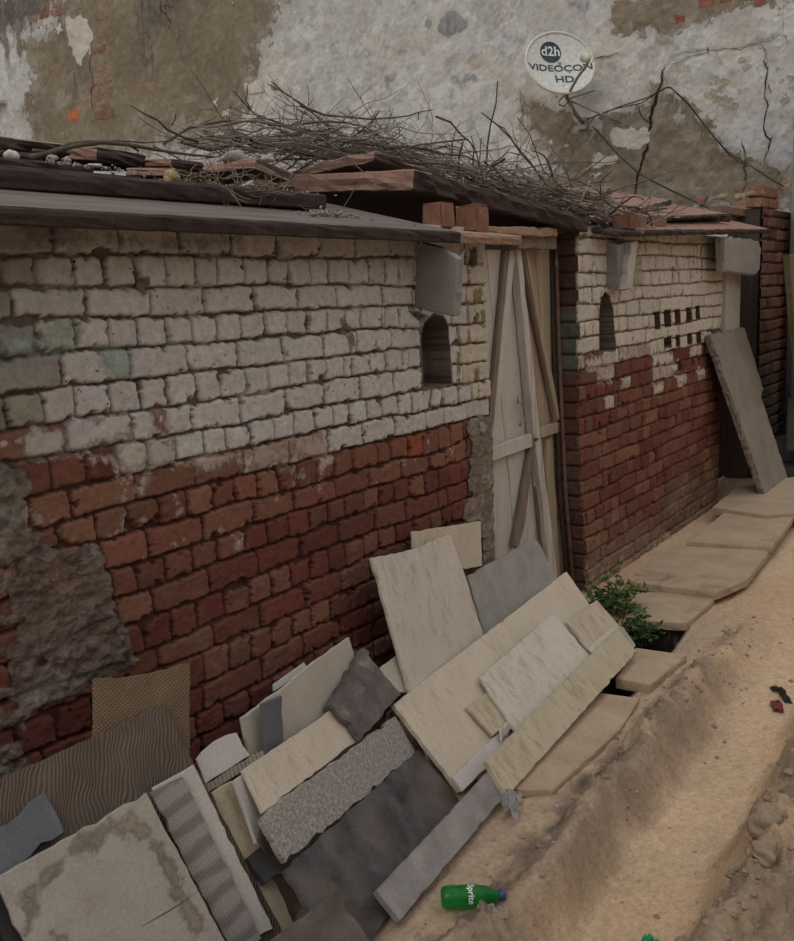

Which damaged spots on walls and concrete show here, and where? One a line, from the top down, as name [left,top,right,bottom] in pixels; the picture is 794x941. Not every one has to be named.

flaking render [14,0,282,160]
flaking render [513,57,792,210]
flaking render [610,0,793,39]
crack [634,22,784,195]
peeling [190,434,334,477]
flaking render [0,402,176,779]